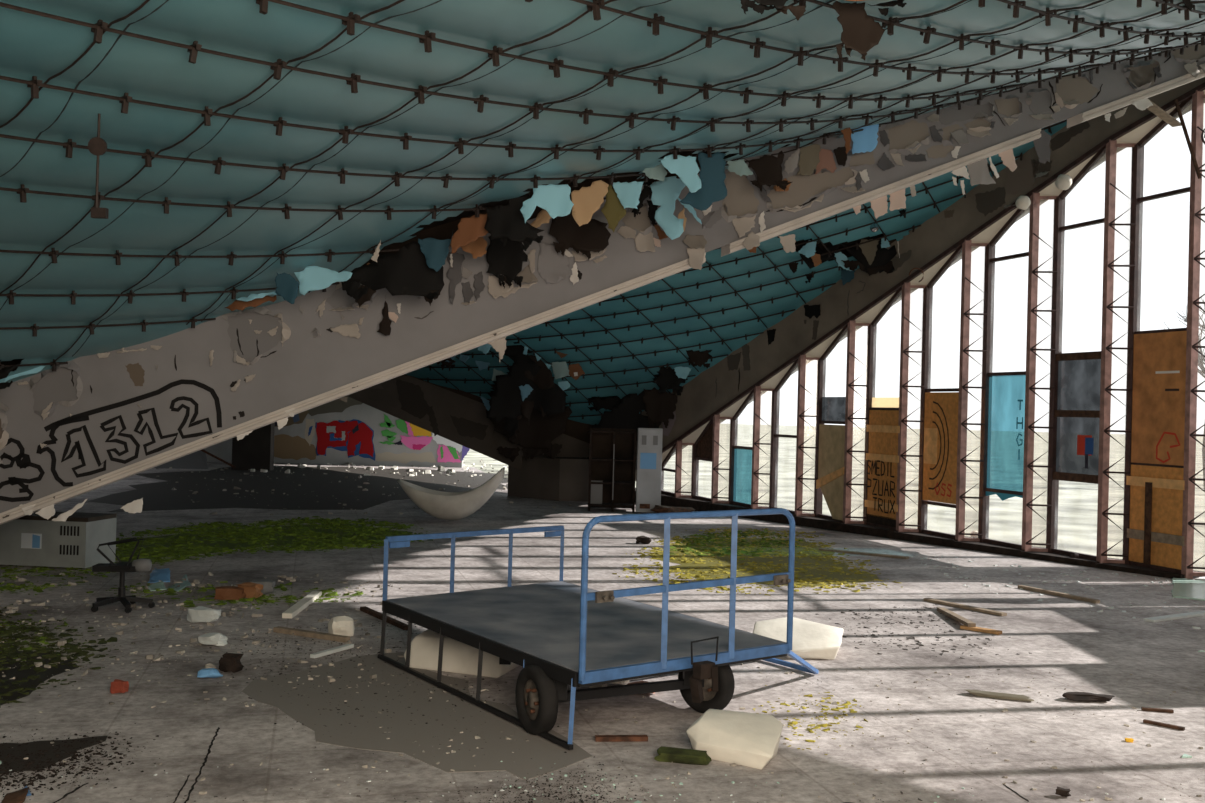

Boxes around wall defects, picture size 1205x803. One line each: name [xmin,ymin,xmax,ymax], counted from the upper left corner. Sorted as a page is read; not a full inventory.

spalling [1171,44,1205,78]
spalling [1051,70,1099,113]
spalling [1105,60,1162,122]
spalling [683,102,1090,270]
spalling [617,203,661,252]
peeling [446,249,538,305]
peeling [565,249,606,285]
spalling [316,281,401,339]
spalling [17,361,83,421]
spalling [0,412,9,464]
peeling [2,496,87,522]
crack [173,727,220,803]